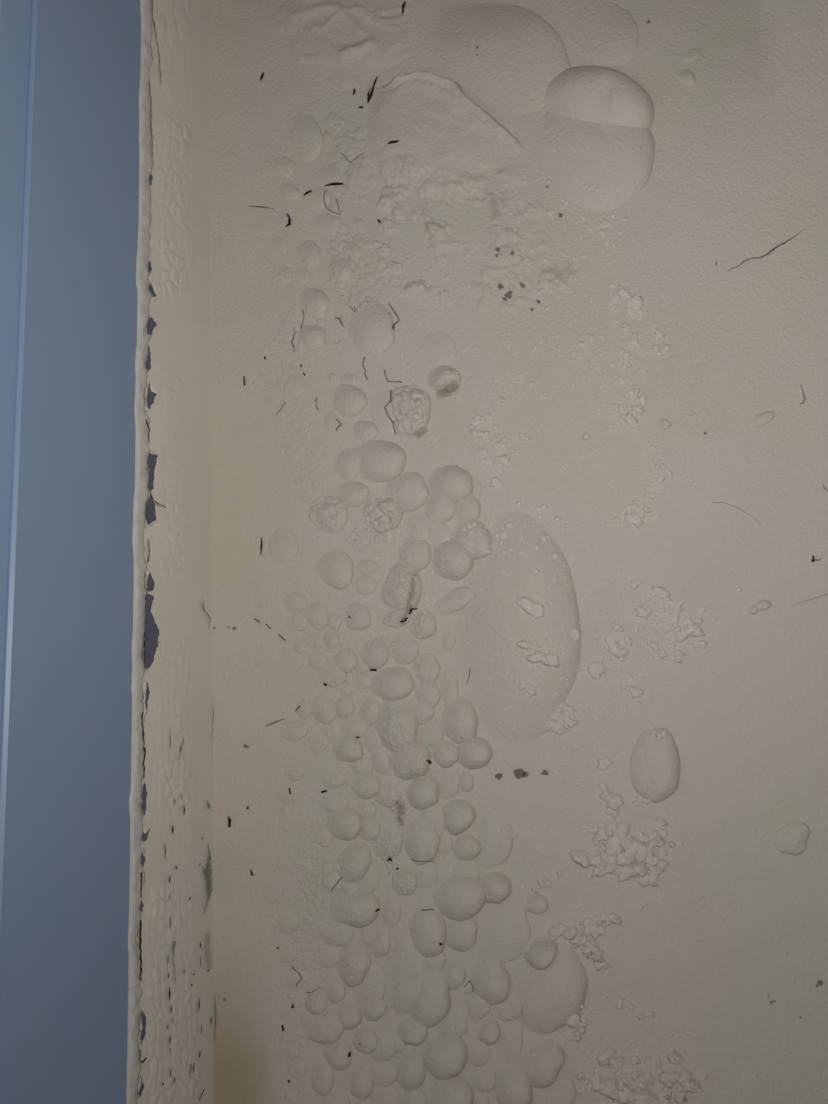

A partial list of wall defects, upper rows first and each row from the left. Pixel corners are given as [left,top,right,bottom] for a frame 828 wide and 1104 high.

crack [149,0,161,161]
peeling [145,261,159,413]
peeling [144,450,159,529]
peeling [143,569,161,716]
crack [139,712,147,778]
crack [136,872,144,980]